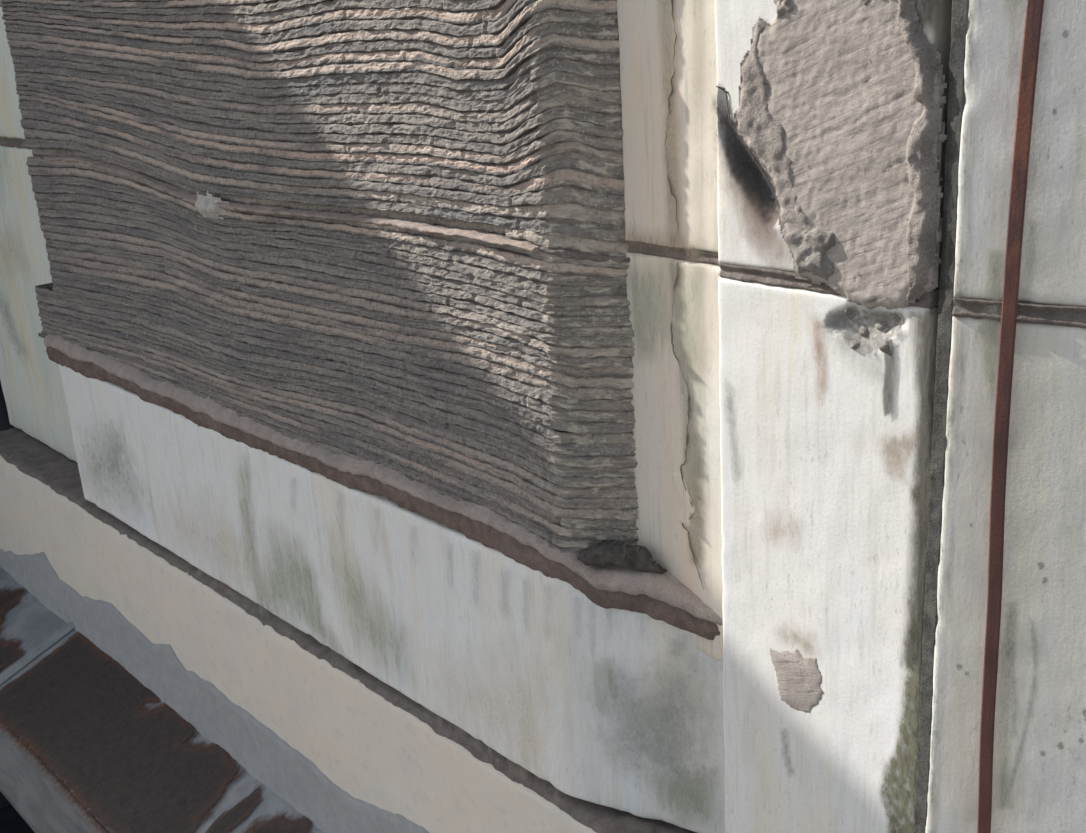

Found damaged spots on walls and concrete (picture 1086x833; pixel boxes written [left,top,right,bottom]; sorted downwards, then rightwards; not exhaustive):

crack [664,0,678,233]
crack [670,262,704,589]
rust [0,588,26,672]
rust [0,631,312,833]